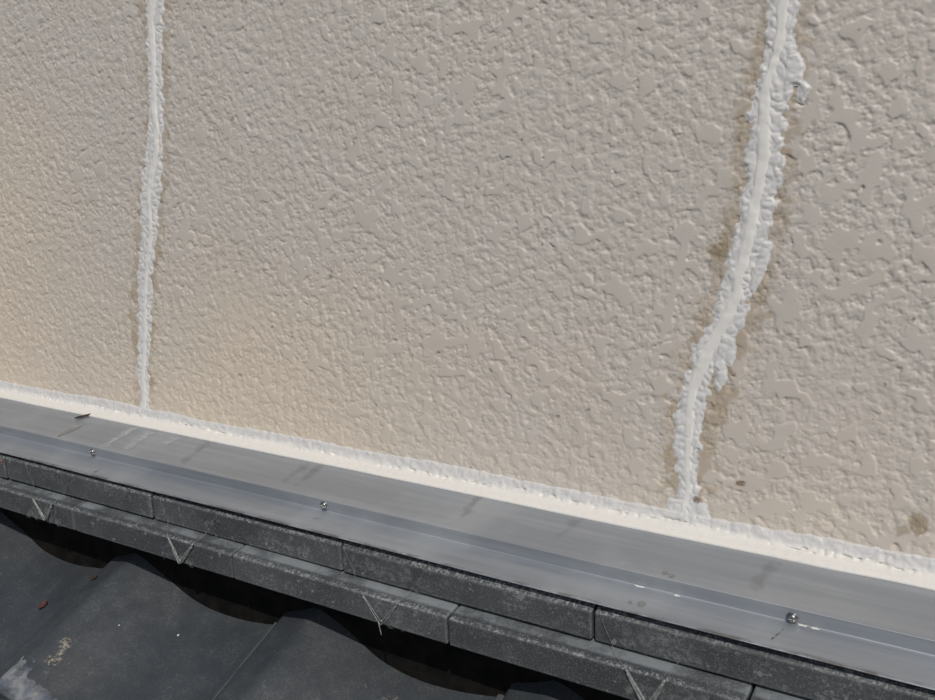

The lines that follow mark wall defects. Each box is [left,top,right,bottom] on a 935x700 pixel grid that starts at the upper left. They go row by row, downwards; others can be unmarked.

crack [136,0,166,409]
crack [667,0,812,518]